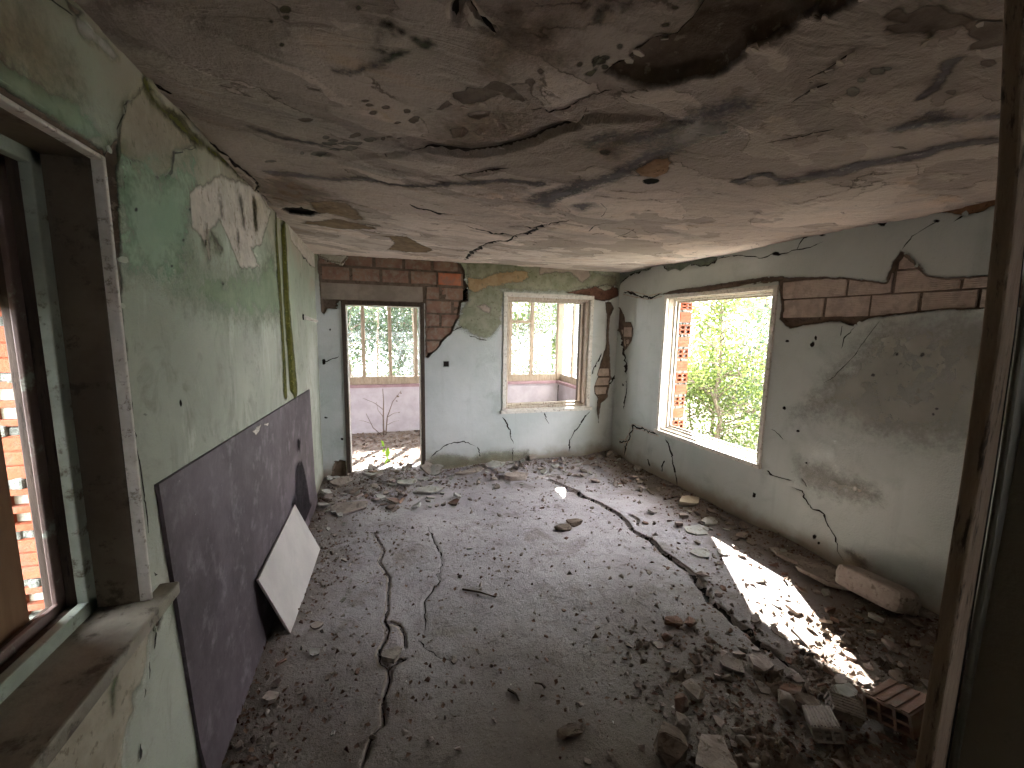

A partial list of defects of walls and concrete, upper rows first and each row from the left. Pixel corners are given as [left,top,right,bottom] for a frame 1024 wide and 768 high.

water stain [264,97,757,210]
water stain [118,154,297,398]
flaking render [190,175,491,359]
crack [431,441,480,457]
crack [410,204,634,260]
flaking render [539,257,717,423]
crack [592,338,677,482]
crack [531,474,803,675]
crack [768,471,842,558]
flaking render [663,251,988,329]
crack [357,527,448,767]